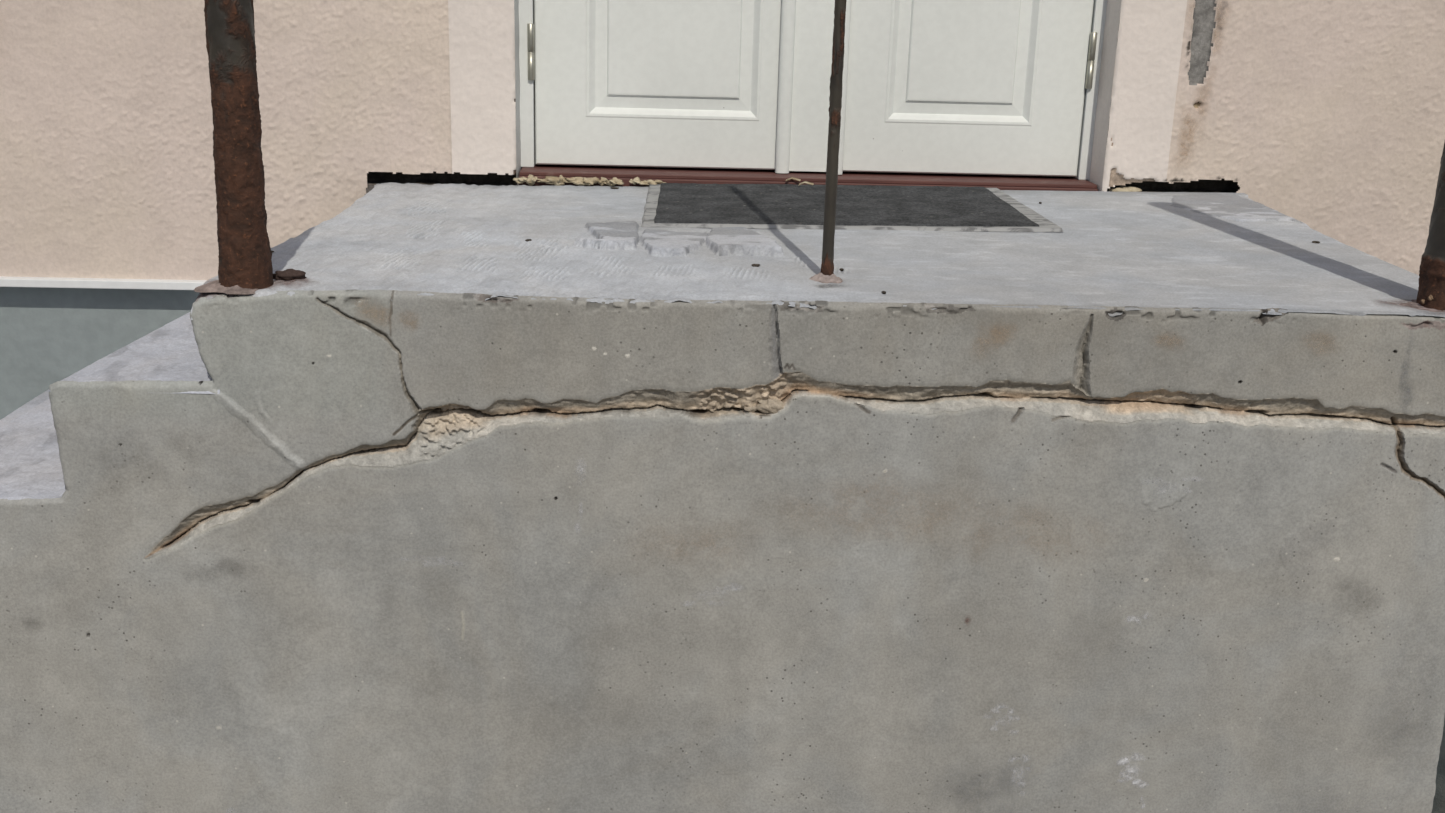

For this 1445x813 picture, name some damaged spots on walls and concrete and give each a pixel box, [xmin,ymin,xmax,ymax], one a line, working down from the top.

flaking render [1188,0,1217,85]
crack [146,290,1445,558]